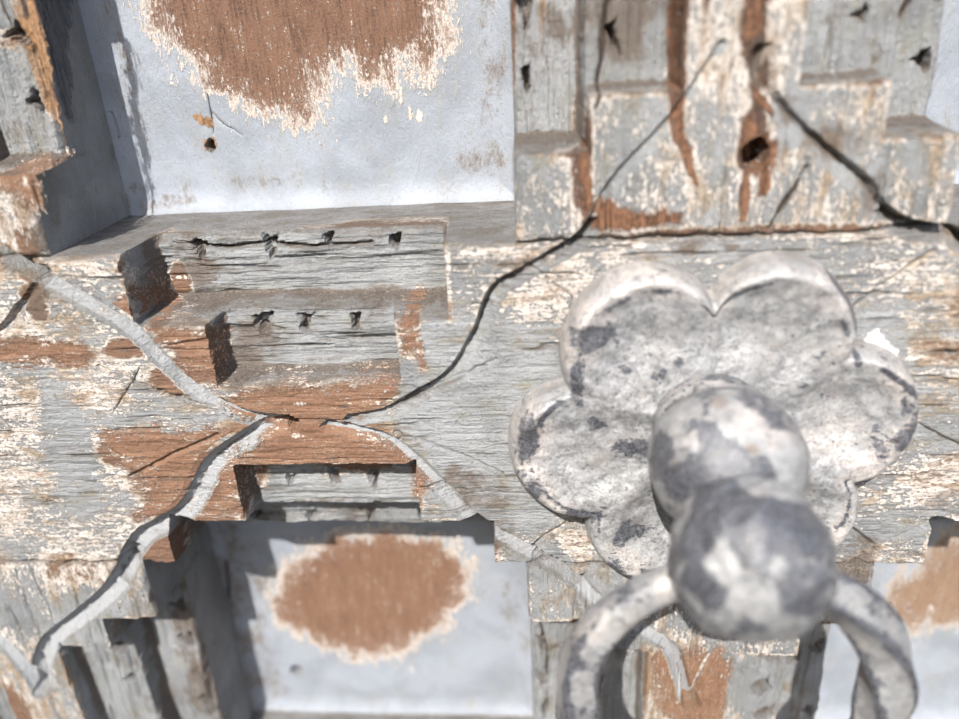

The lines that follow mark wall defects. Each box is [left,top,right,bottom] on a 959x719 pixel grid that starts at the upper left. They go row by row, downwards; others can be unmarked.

peeling [120,0,471,147]
crack [768,166,805,229]
peeling [0,331,94,375]
crack [113,368,140,412]
peeling [85,266,435,526]
peeling [254,521,491,674]
peeling [875,521,959,646]